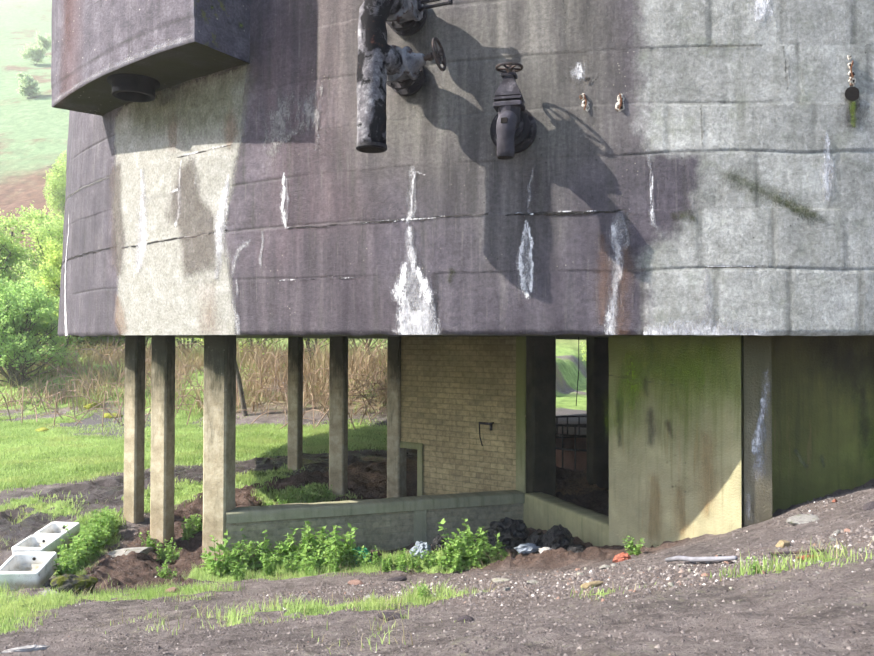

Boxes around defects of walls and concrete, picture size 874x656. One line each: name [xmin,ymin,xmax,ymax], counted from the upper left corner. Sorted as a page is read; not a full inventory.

spalling [579,93,590,112]
crack [61,229,228,267]
water stain [110,64,248,335]
water stain [395,168,440,335]
water stain [518,221,534,298]
water stain [605,222,628,335]
water stain [752,371,769,475]